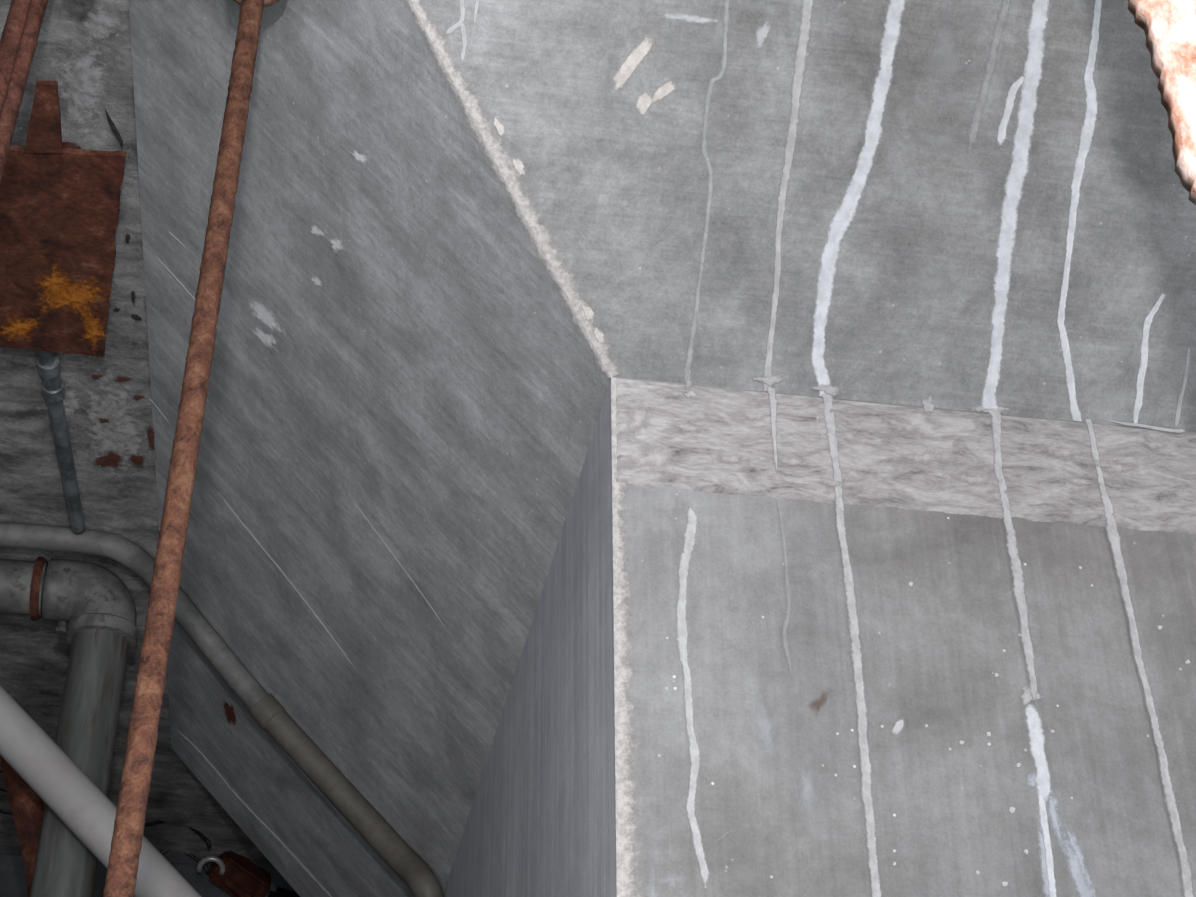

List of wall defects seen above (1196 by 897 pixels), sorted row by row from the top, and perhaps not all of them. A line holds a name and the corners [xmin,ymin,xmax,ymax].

water stain [968,0,1095,897]
water stain [1057,0,1194,897]
crack [1104,347,1190,433]